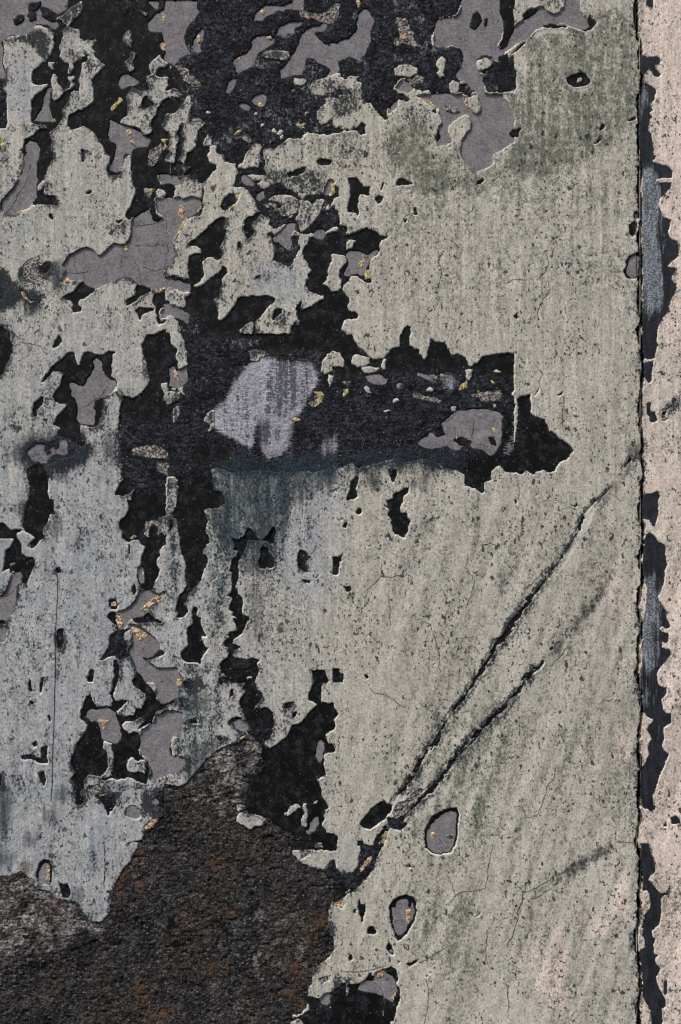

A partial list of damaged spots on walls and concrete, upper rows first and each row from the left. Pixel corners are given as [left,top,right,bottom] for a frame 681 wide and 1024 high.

crack [633,0,641,102]
damp [13,432,89,476]
spalling [0,499,468,1024]
damp [212,454,338,570]
peeling [0,0,596,642]
crack [369,688,441,724]
crack [521,765,556,818]
crack [632,726,640,1024]
crack [634,232,644,685]
peeling [623,55,678,383]
peeling [637,843,668,1024]
peeling [637,492,671,812]